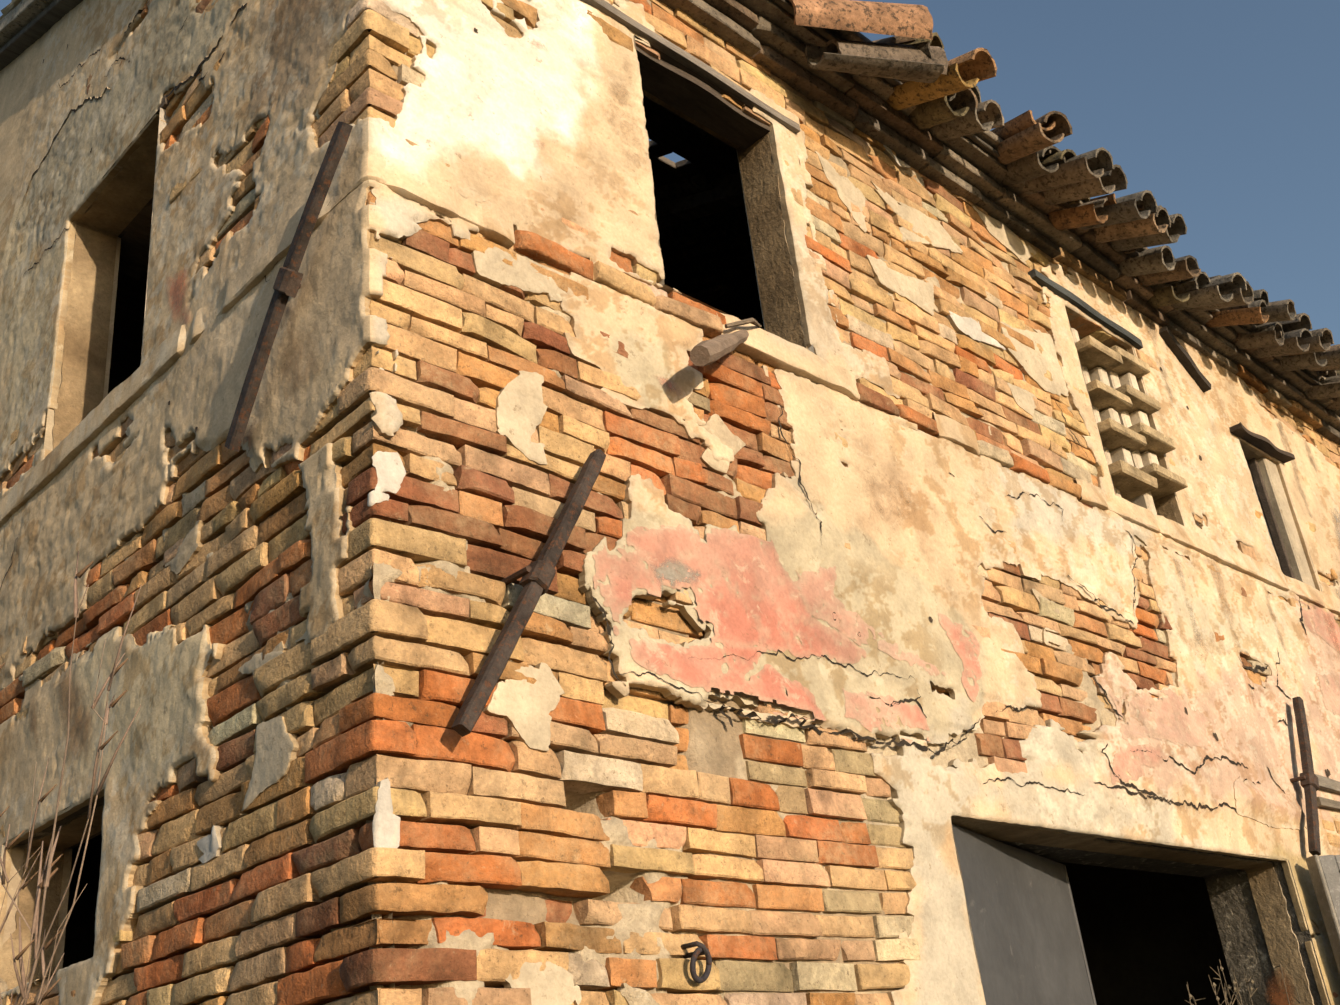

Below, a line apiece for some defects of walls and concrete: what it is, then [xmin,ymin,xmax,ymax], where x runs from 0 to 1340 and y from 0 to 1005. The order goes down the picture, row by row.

crack [15,0,150,222]
flaking render [160,60,220,150]
crack [164,3,247,99]
flaking render [312,0,435,148]
flaking render [481,0,538,38]
crack [23,221,73,276]
flaking render [169,115,270,274]
flaking render [587,0,1118,508]
flaking render [0,220,1219,1005]
crack [592,596,1037,756]
crack [983,673,1285,811]
flaking render [1318,569,1338,586]